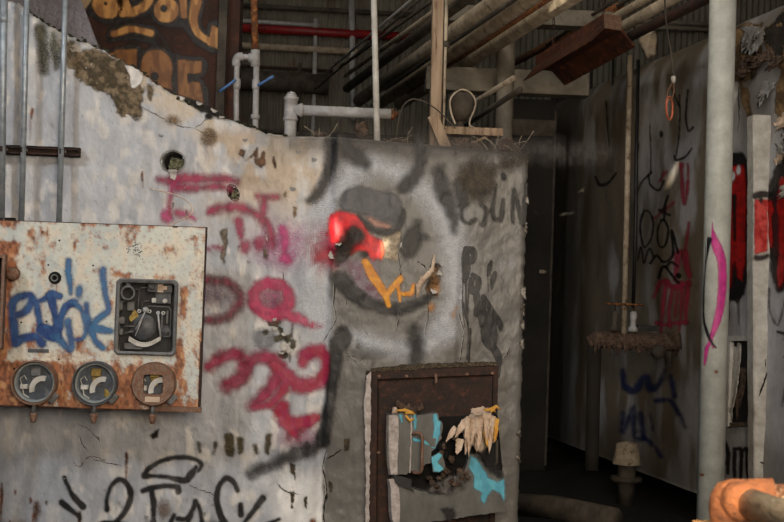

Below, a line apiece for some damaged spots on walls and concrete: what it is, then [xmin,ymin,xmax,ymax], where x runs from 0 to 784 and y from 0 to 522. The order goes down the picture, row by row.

spalling [67,40,153,121]
peeling [735,9,784,165]
crack [144,108,216,137]
peeling [416,254,443,298]
spalling [262,318,296,359]